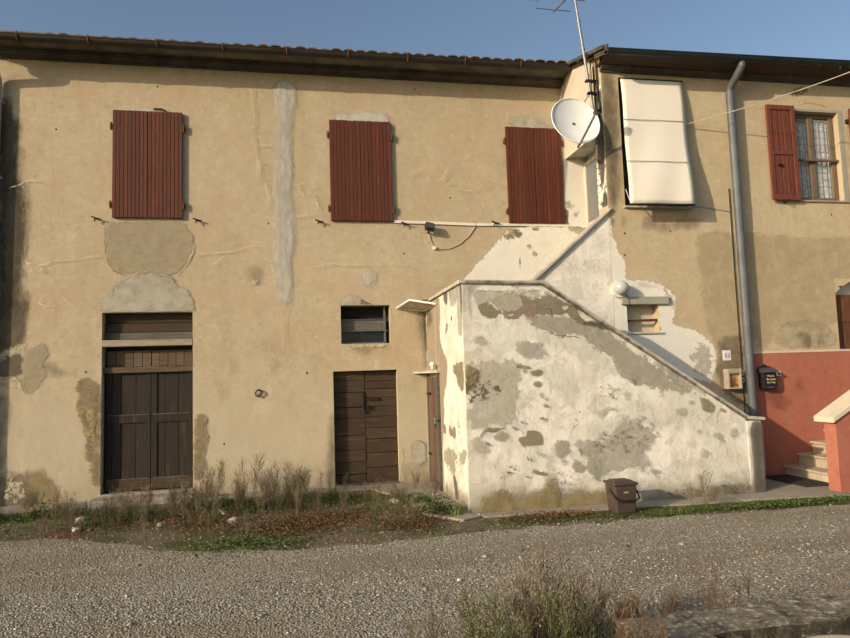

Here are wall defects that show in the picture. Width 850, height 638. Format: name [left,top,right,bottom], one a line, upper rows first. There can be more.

leakage [0,102,28,353]
peeling [0,343,27,390]
peeling [75,371,101,487]
peeling [426,298,659,494]
peeling [473,289,725,416]
leakage [479,480,608,513]